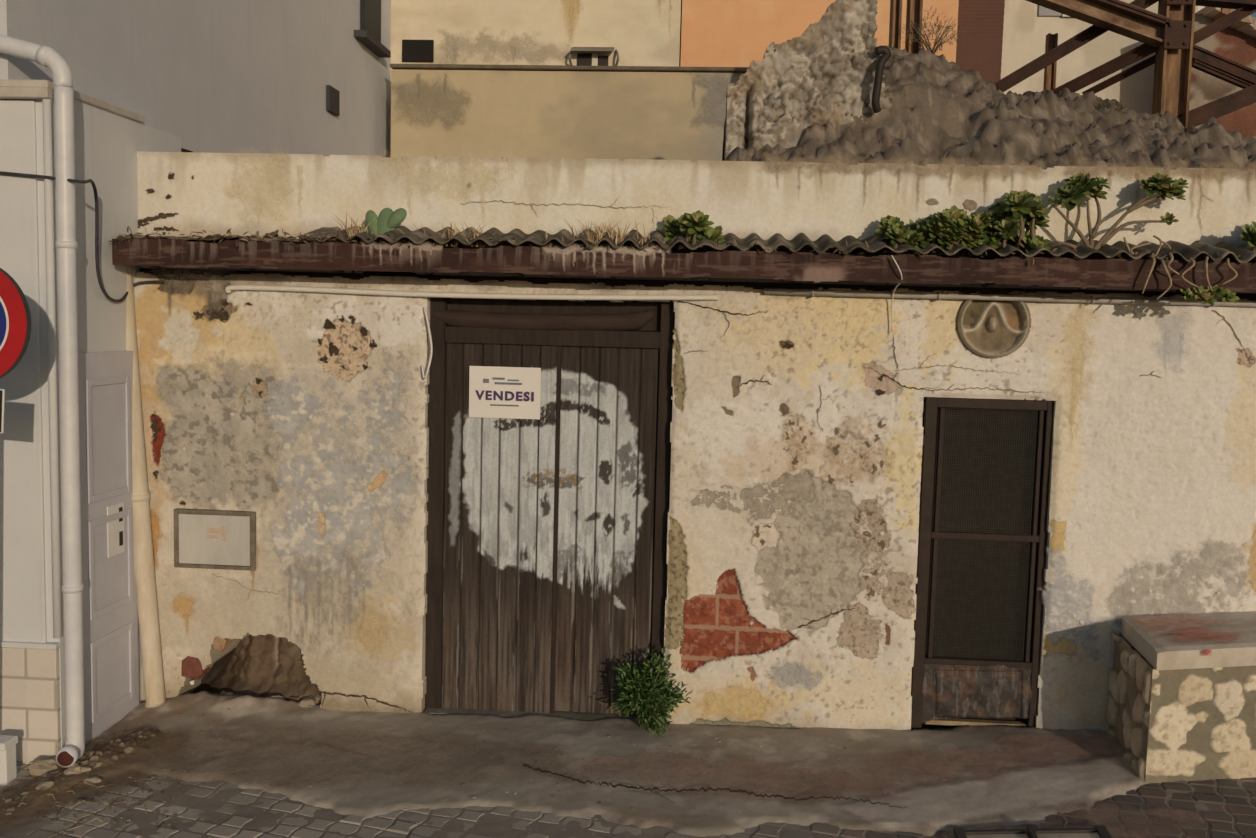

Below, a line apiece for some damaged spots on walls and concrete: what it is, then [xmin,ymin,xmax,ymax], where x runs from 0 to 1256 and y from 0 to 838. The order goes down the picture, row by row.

leakage [766,156,1040,201]
spalling [317,315,377,382]
spalling [862,362,899,396]
crack [1212,310,1253,365]
peeling [150,363,283,510]
peeling [665,403,915,681]
peeling [1043,549,1098,660]
peeling [1109,542,1252,634]
hole [178,634,322,707]
crack [318,690,414,713]
crack [523,763,907,808]